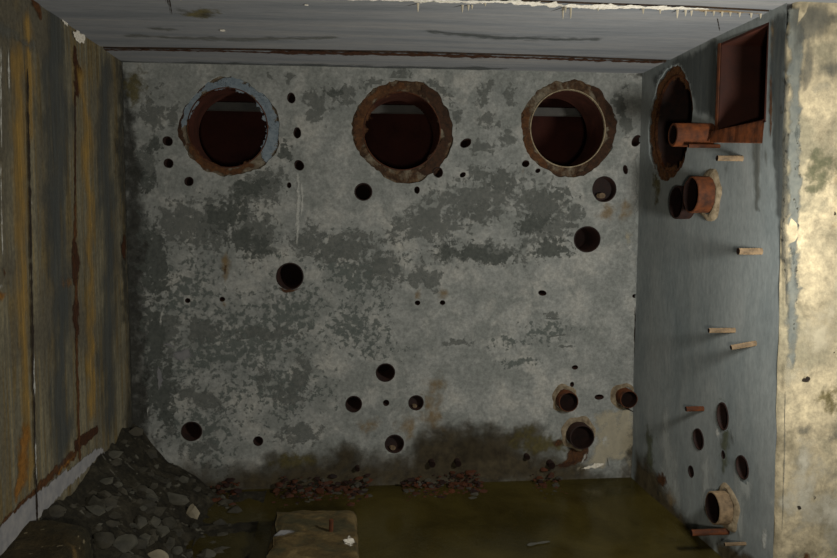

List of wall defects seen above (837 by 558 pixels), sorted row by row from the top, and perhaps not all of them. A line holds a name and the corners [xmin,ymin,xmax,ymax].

leakage [430,31,599,41]
leakage [370,0,762,19]
leakage [654,42,717,119]
corrosion [1,18,98,525]
leakage [32,0,72,463]
leakage [97,60,608,494]
leakage [753,7,836,367]
leakage [819,391,834,412]
leakage [623,411,752,558]